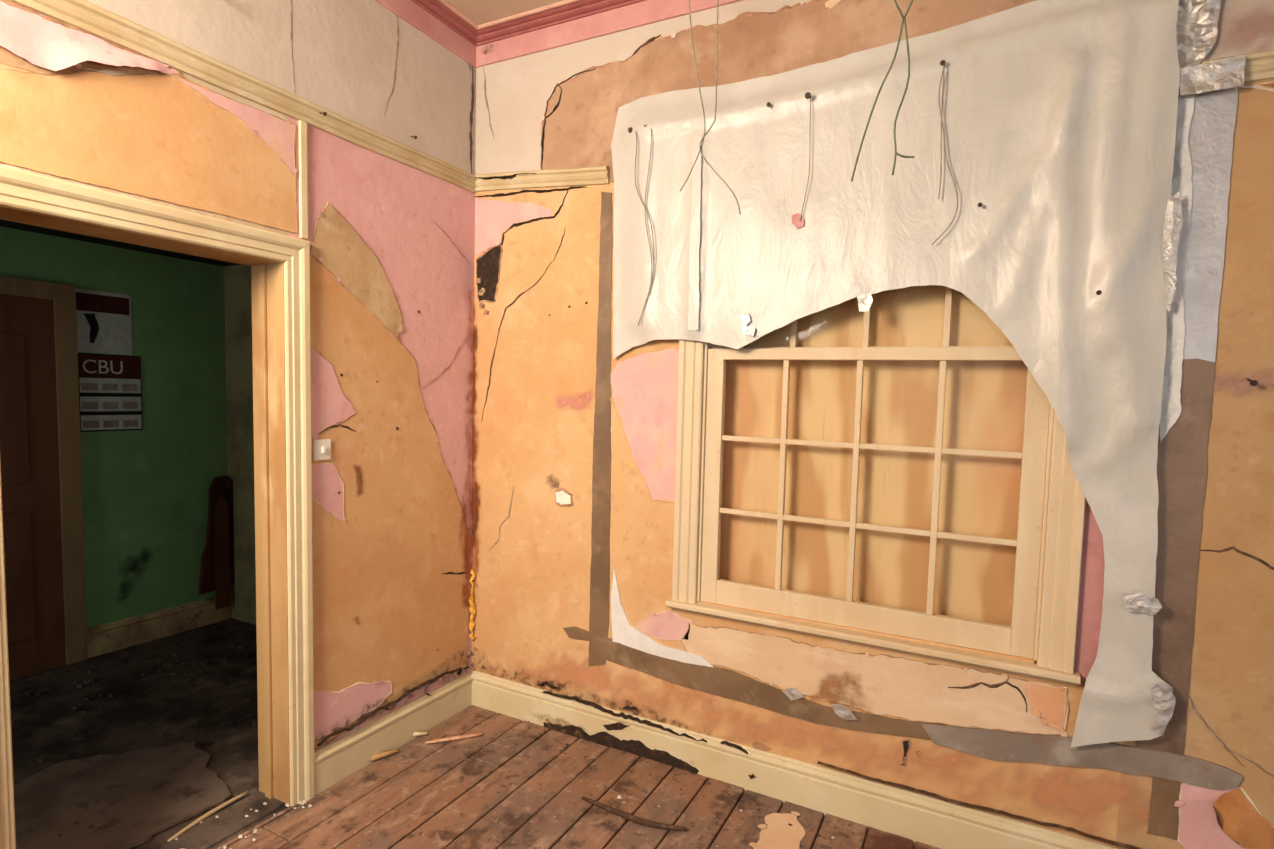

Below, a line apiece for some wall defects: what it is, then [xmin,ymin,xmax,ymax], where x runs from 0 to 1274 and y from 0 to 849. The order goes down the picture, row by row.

peeling [0,0,182,77]
crack [469,66,494,174]
crack [541,68,596,170]
flaking render [540,0,1037,183]
crack [422,190,568,422]
corrosion [462,299,479,606]
crack [1200,546,1274,570]
flaking render [634,499,1105,737]
peeling [314,680,392,740]
damp [503,661,842,755]
crack [948,677,1027,713]
peeling [1174,783,1274,849]